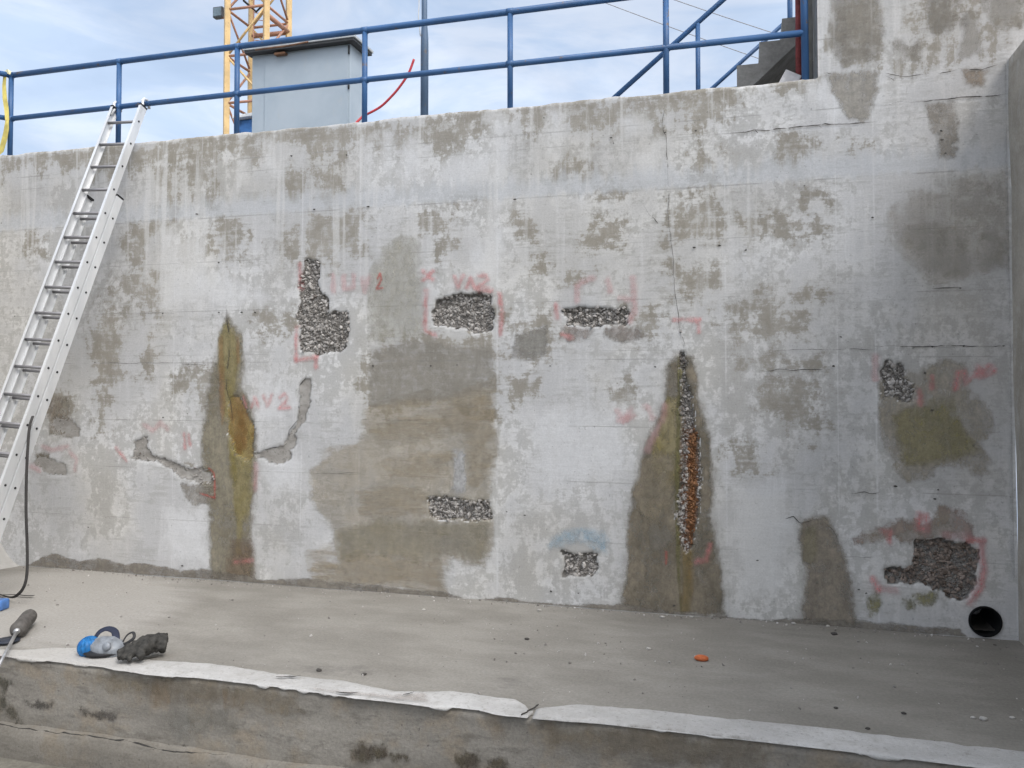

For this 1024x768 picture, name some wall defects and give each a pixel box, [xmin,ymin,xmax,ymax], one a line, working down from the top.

spalling [296,259,350,355]
spalling [432,294,495,334]
spalling [561,306,629,328]
spalling [879,360,915,402]
water stain [879,360,991,482]
water stain [29,318,461,598]
spalling [428,496,493,522]
water stain [484,356,974,637]
spalling [564,550,598,576]
spalling [884,538,980,600]